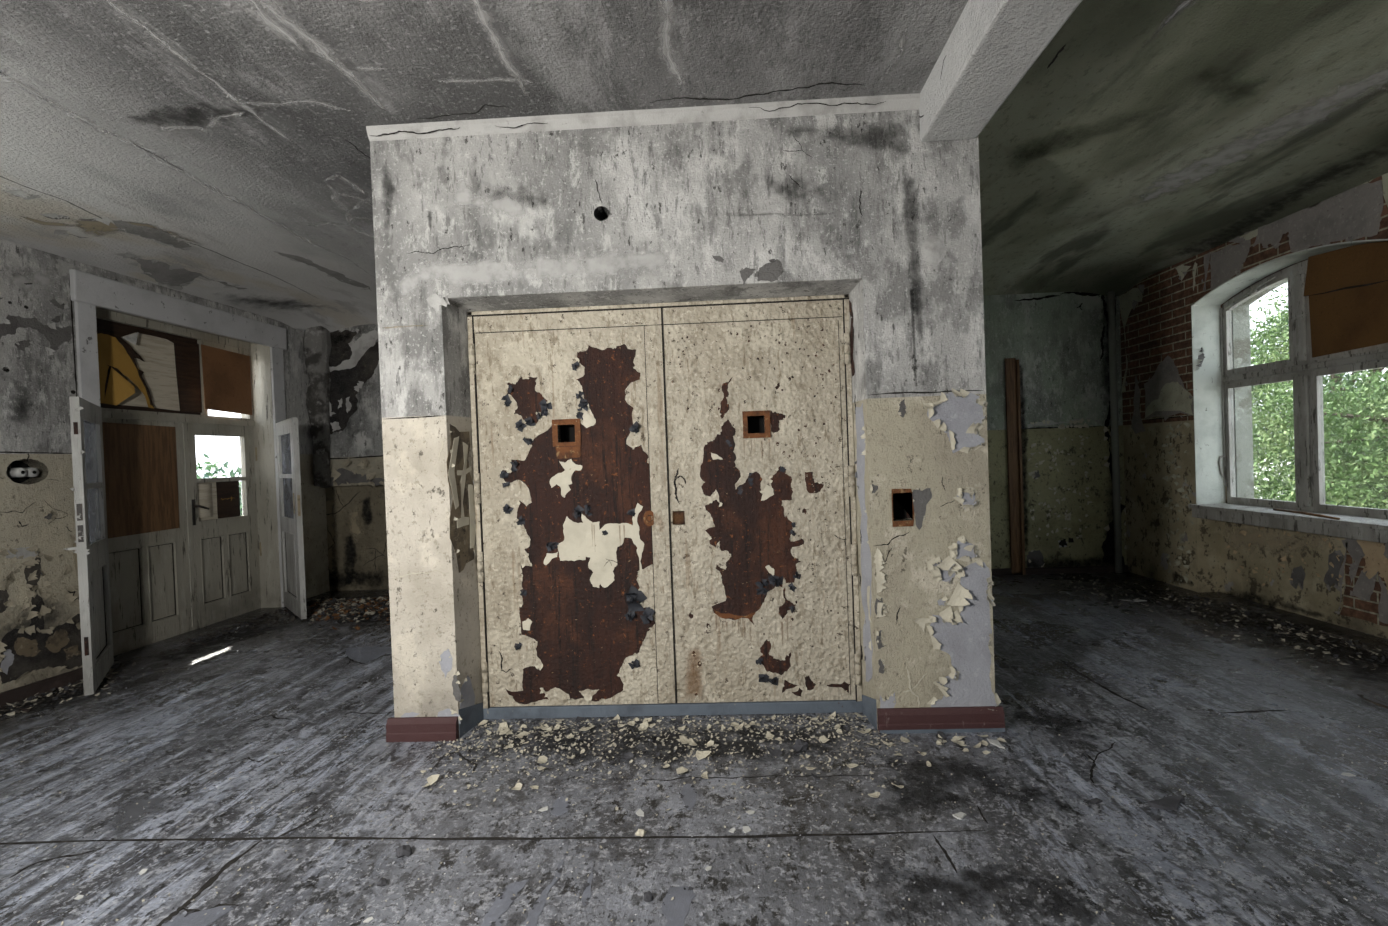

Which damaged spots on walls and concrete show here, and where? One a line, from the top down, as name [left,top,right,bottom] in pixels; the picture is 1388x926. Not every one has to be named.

damp [139,109,255,124]
damp [829,128,895,148]
damp [1142,70,1388,200]
damp [905,180,916,240]
spalling [0,298,73,356]
spalling [740,259,784,284]
damp [910,259,922,365]
spalling [329,328,379,434]
peeling [0,450,90,684]
peeling [854,403,887,682]
peeling [1357,540,1388,593]
peeling [914,535,1001,711]